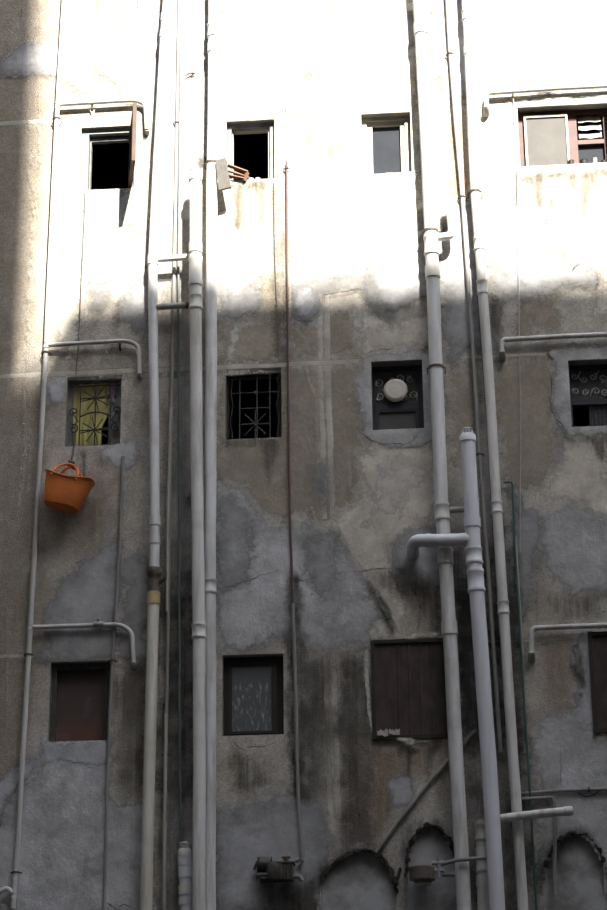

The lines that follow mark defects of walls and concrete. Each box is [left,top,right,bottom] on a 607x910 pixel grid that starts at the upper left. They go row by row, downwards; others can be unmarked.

damp [402,208,424,235]
damp [527,172,598,214]
damp [216,181,391,523]
damp [285,576,372,847]
spalling [318,819,457,910]
spalling [539,829,607,910]